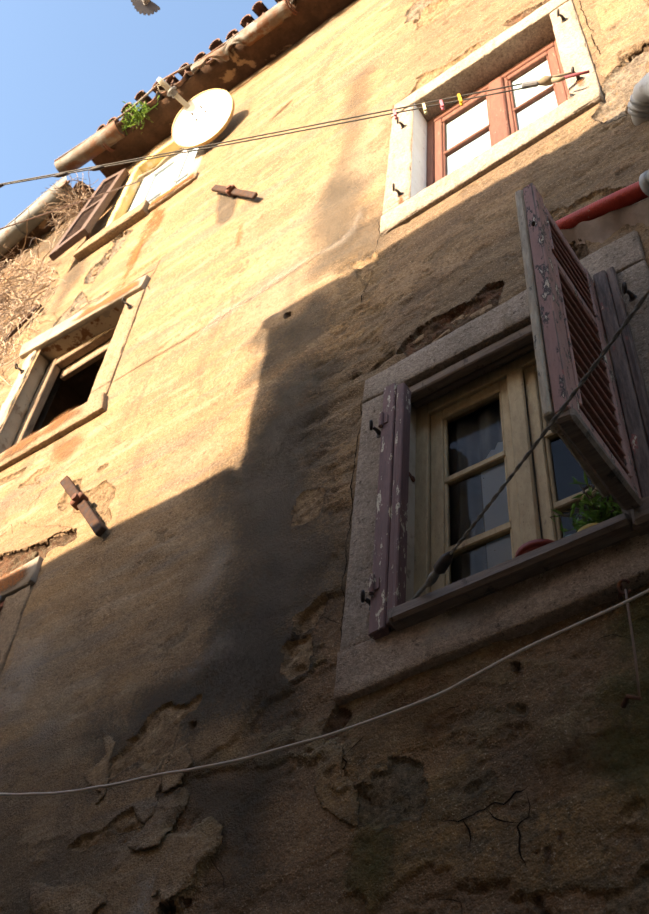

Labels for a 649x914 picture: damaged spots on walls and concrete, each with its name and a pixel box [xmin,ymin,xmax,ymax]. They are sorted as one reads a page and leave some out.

peeling [591,0,649,123]
spalling [569,239,589,260]
spalling [396,280,504,357]
spalling [56,491,80,513]
spalling [73,463,116,526]
peeling [0,521,77,578]
spalling [280,591,328,682]
peeling [67,694,223,914]
crack [438,786,530,865]